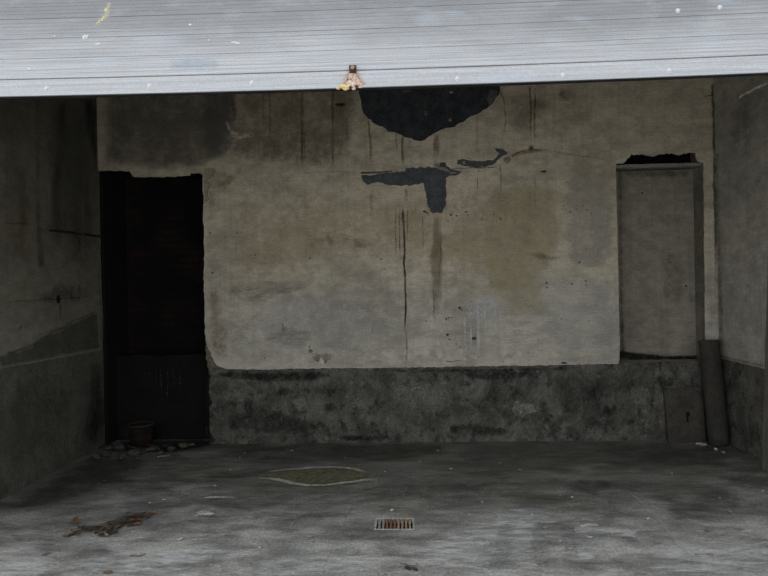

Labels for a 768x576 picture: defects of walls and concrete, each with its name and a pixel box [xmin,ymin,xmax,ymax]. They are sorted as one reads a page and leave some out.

spalling [359,86,500,141]
spalling [361,148,511,221]
spalling [617,153,691,165]
leakage [241,372,328,395]